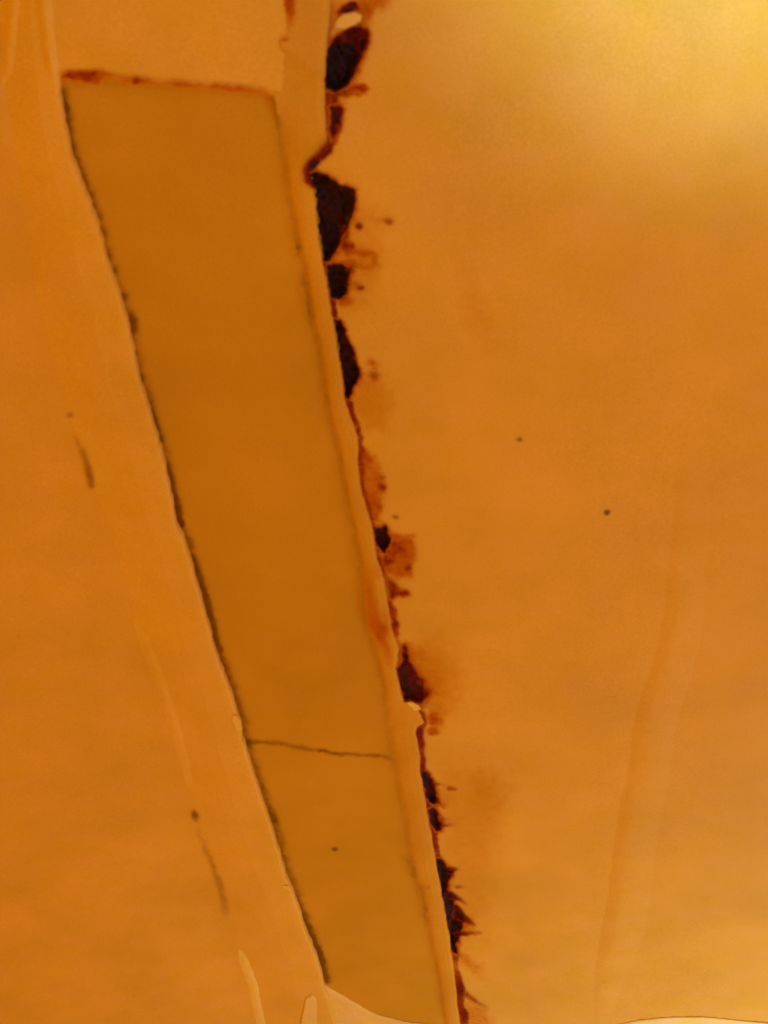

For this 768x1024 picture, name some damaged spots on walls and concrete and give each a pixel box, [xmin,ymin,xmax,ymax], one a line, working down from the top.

spalling [324,0,371,154]
corrosion [358,0,388,28]
spalling [310,170,377,401]
corrosion [358,449,386,522]
spalling [372,523,436,711]
spalling [420,770,474,956]
peeling [301,994,317,1024]
peeling [326,986,424,1024]